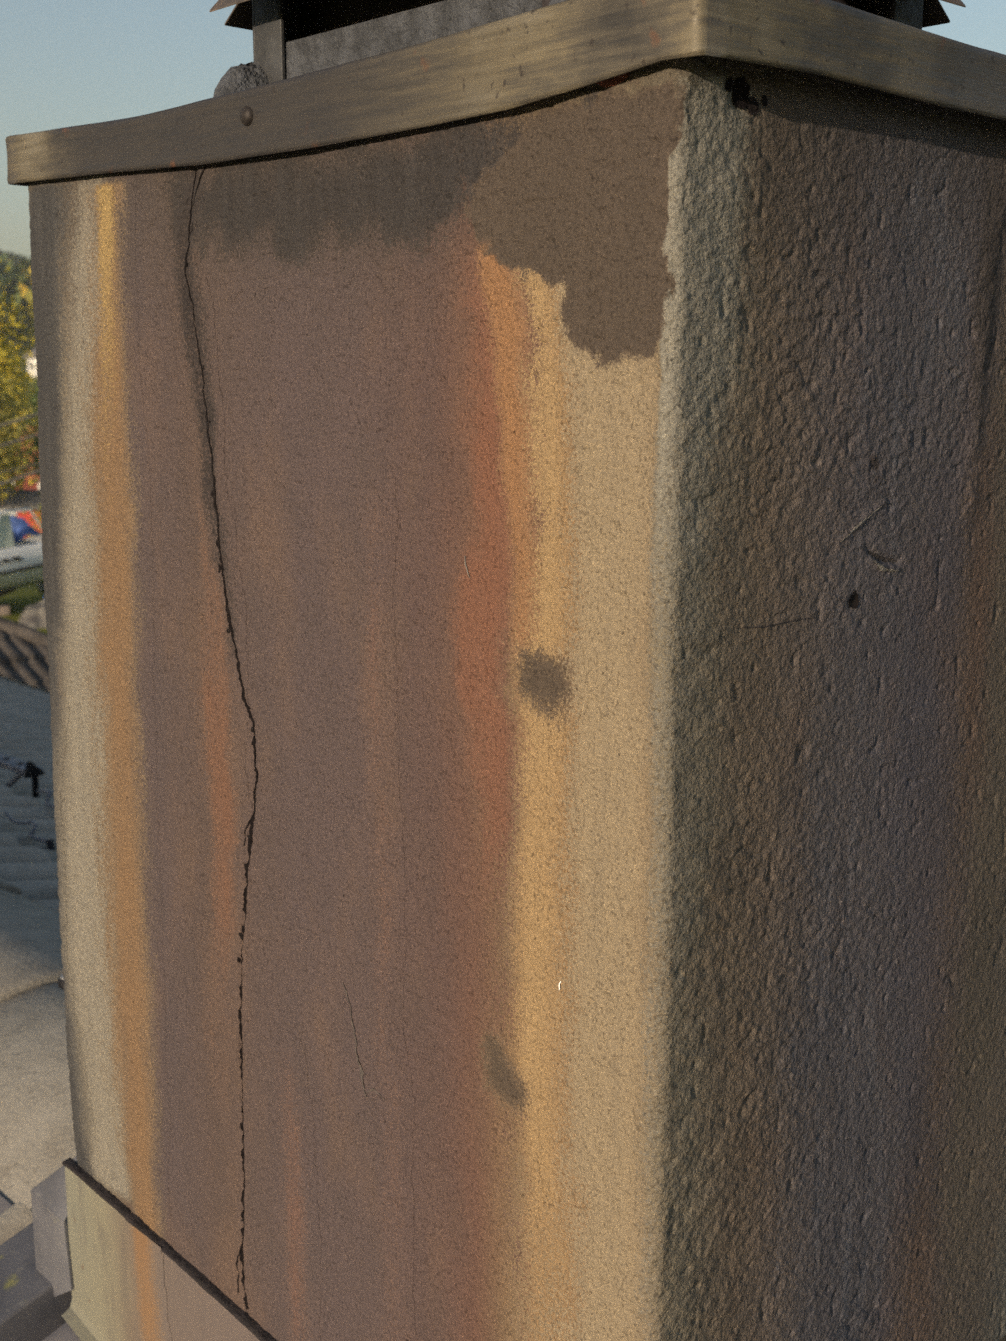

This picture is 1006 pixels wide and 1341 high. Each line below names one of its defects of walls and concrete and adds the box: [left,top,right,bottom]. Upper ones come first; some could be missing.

corrosion [70,173,172,1341]
crack [184,165,258,1310]
damp [458,59,775,1341]
damp [955,156,1006,488]